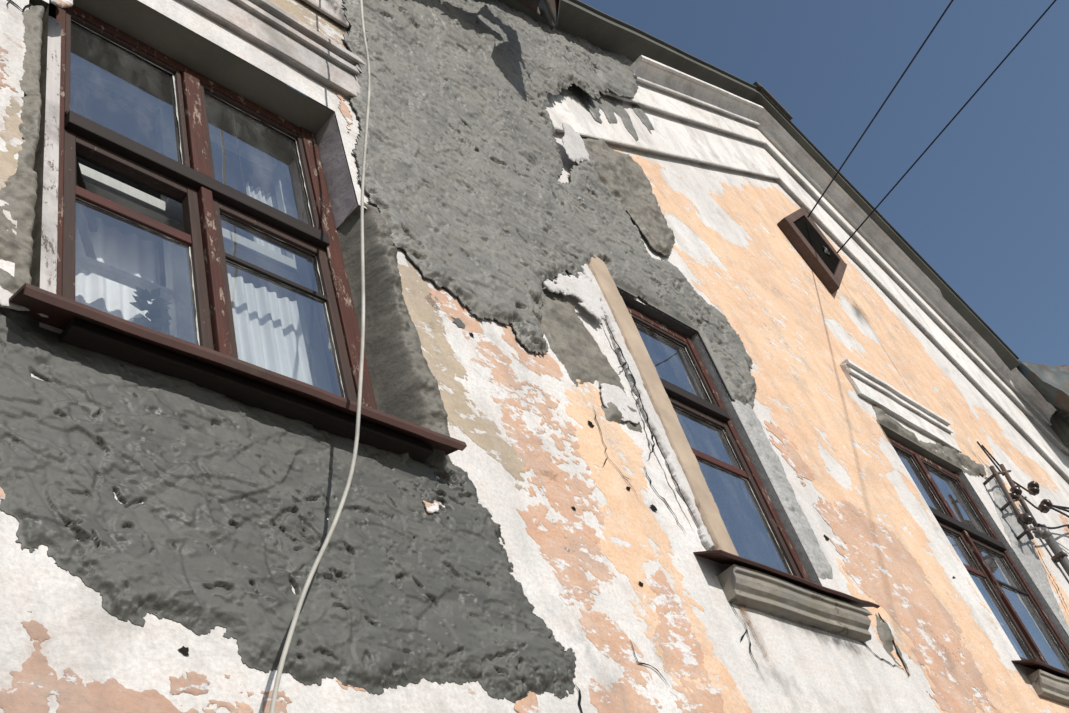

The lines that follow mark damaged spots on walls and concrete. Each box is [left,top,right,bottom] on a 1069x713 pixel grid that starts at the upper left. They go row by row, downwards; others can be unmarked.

flaking render [0,0,49,318]
peeling [337,201,753,713]
crack [593,319,702,533]
peeling [562,122,1069,713]
peeling [0,599,292,713]
crack [575,684,583,713]
crack [731,604,761,674]